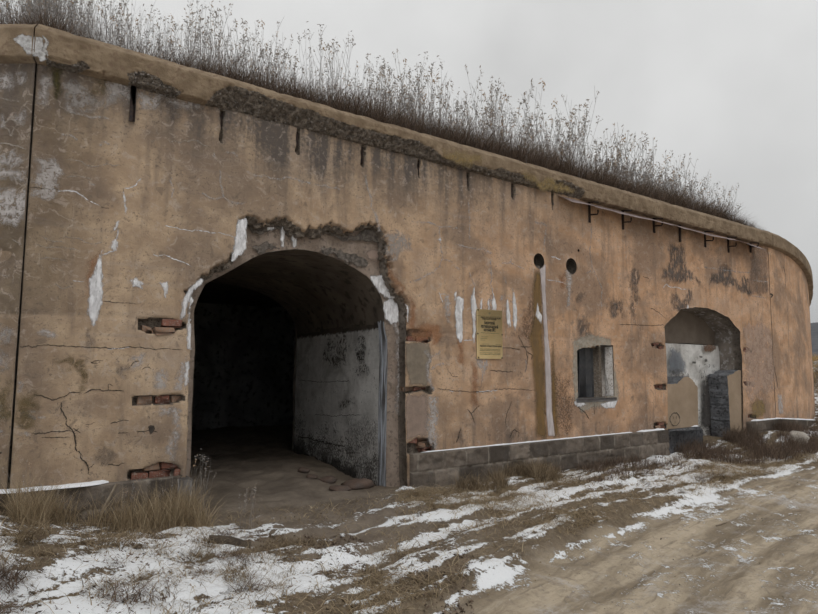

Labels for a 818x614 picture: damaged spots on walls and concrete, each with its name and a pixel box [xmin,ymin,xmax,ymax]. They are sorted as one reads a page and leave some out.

spalling [204,85,585,199]
spalling [184,253,244,310]
spalling [138,317,187,335]
spalling [237,216,435,454]
spalling [132,394,185,406]
crack [33,384,156,474]
spalling [127,462,182,480]